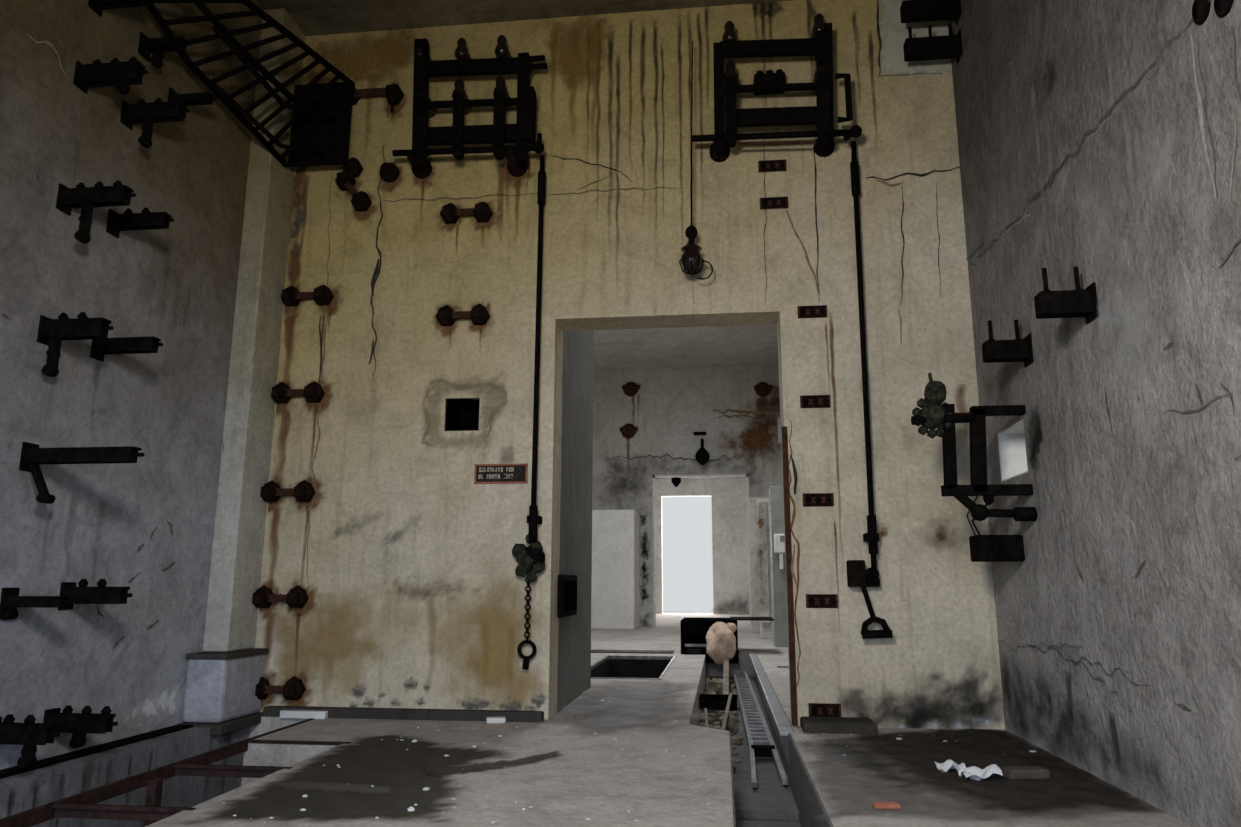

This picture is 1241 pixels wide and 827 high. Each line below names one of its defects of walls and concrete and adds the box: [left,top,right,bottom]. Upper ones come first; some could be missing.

damp [549,20,664,137]
damp [678,11,709,129]
corrosion [441,158,532,238]
crack [867,0,1241,343]
crack [369,145,676,375]
corrosion [276,382,292,461]
corrosion [306,381,332,445]
corrosion [729,388,780,457]
corrosion [268,477,322,557]
corrosion [259,581,314,654]
damp [843,666,1086,755]
damp [210,735,561,820]